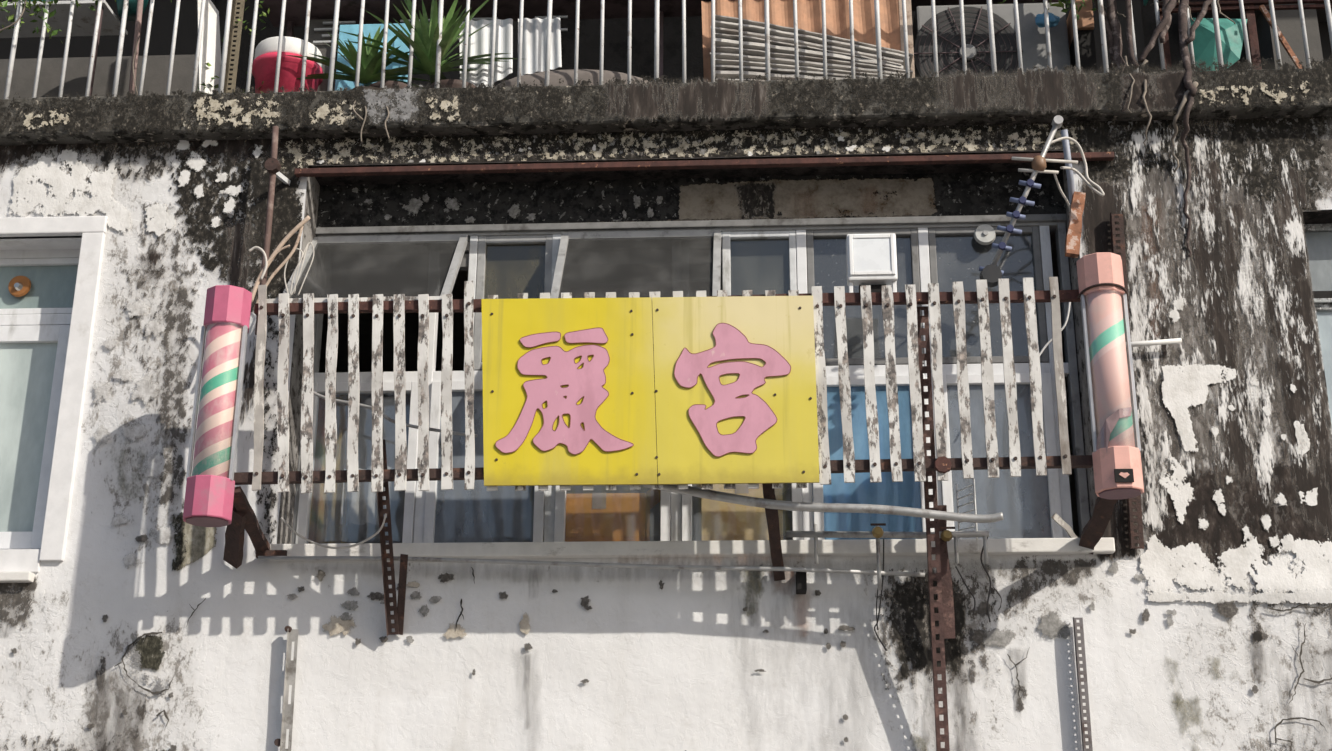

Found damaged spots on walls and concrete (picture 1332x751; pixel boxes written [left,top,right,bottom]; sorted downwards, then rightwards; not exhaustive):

peeling [22,108,70,131]
peeling [310,101,361,125]
water stain [0,55,1332,135]
peeling [4,149,176,237]
peeling [174,140,244,228]
peeling [1117,129,1215,245]
water stain [0,116,1332,691]
peeling [1127,236,1332,646]
water stain [5,691,146,751]
spalling [125,634,173,698]
water stain [1012,685,1027,712]
crack [1267,604,1332,751]